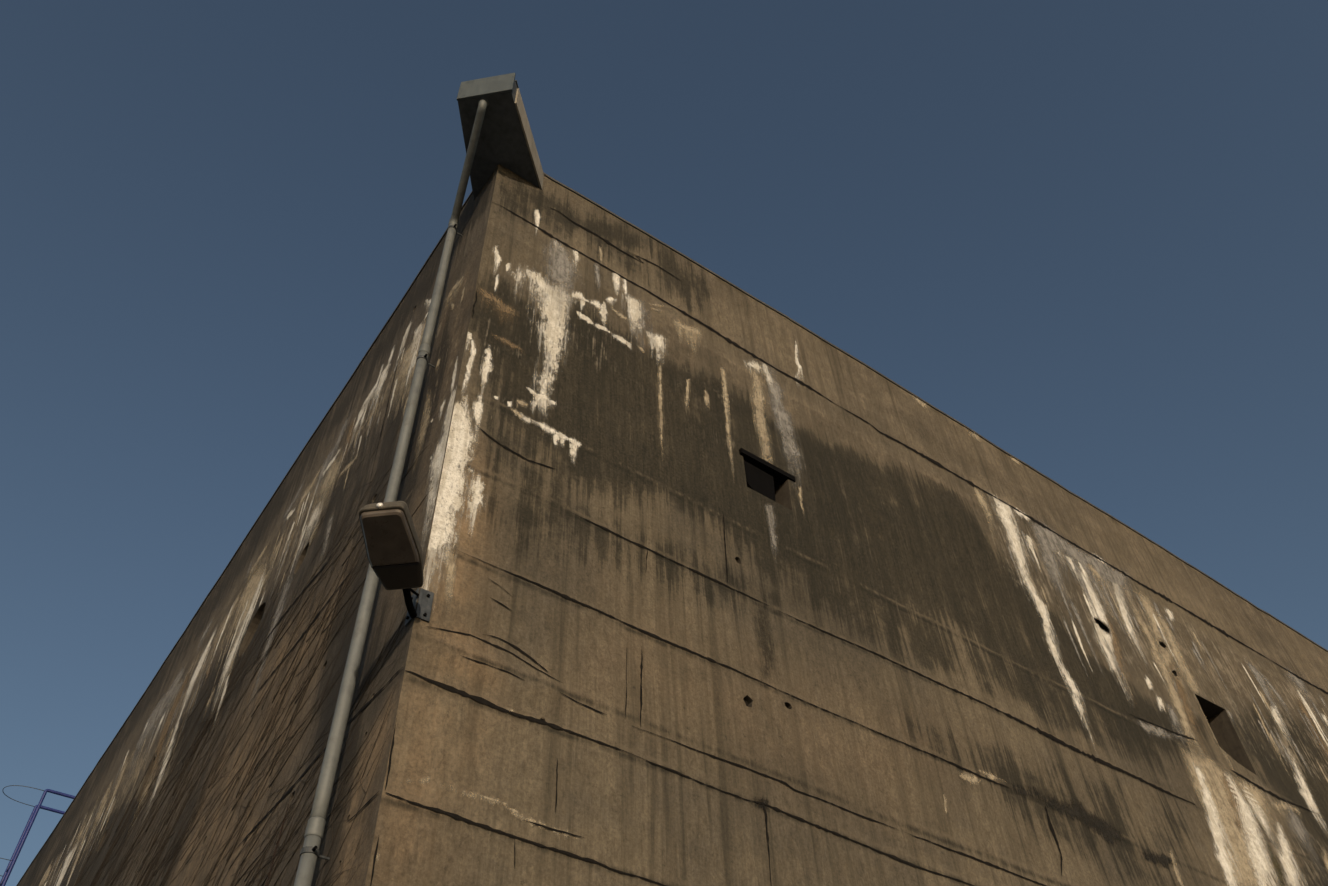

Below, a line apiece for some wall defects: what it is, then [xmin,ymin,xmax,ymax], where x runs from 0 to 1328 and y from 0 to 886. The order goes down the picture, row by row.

efflorescence [31,277,465,886]
crack [235,747,326,850]
crack [255,341,404,695]
crack [480,428,557,470]
efflorescence [418,237,665,593]
crack [347,548,1047,886]
leakage [765,505,777,548]
efflorescence [748,360,800,459]
crack [571,512,1201,805]
crack [492,202,1328,694]
leakage [975,488,1328,886]
crack [1231,770,1312,812]